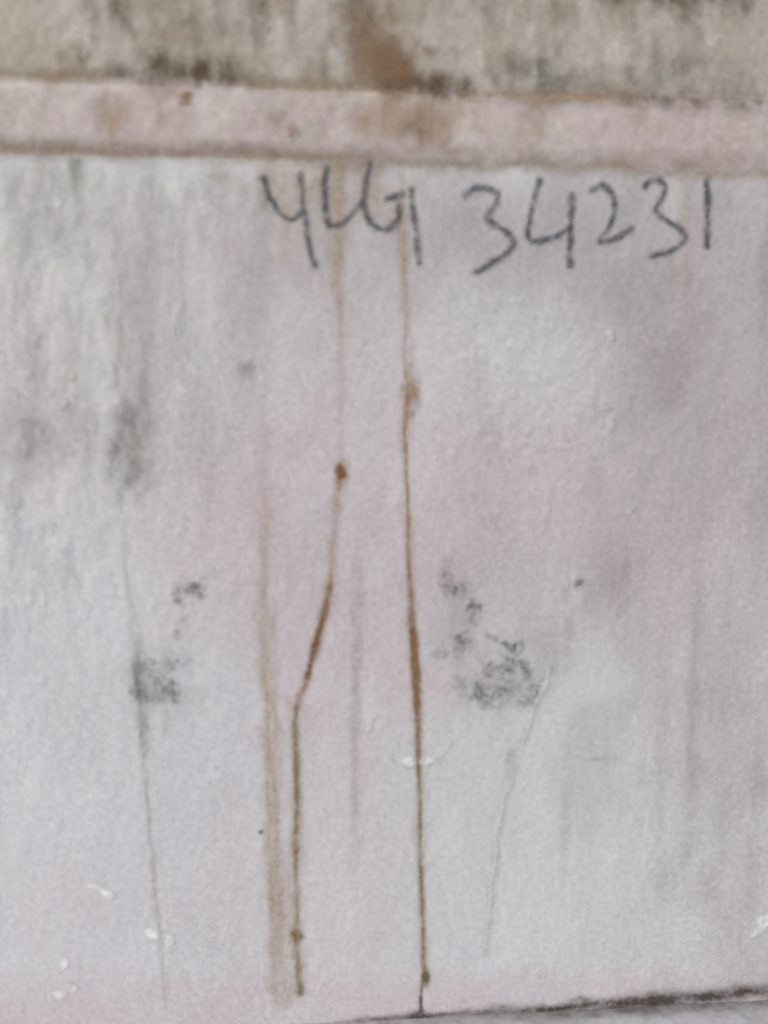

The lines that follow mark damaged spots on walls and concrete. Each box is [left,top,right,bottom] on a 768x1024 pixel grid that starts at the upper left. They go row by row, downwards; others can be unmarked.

leakage [151,54,235,84]
leakage [296,76,447,98]
leakage [462,60,610,102]
rust [335,463,346,483]